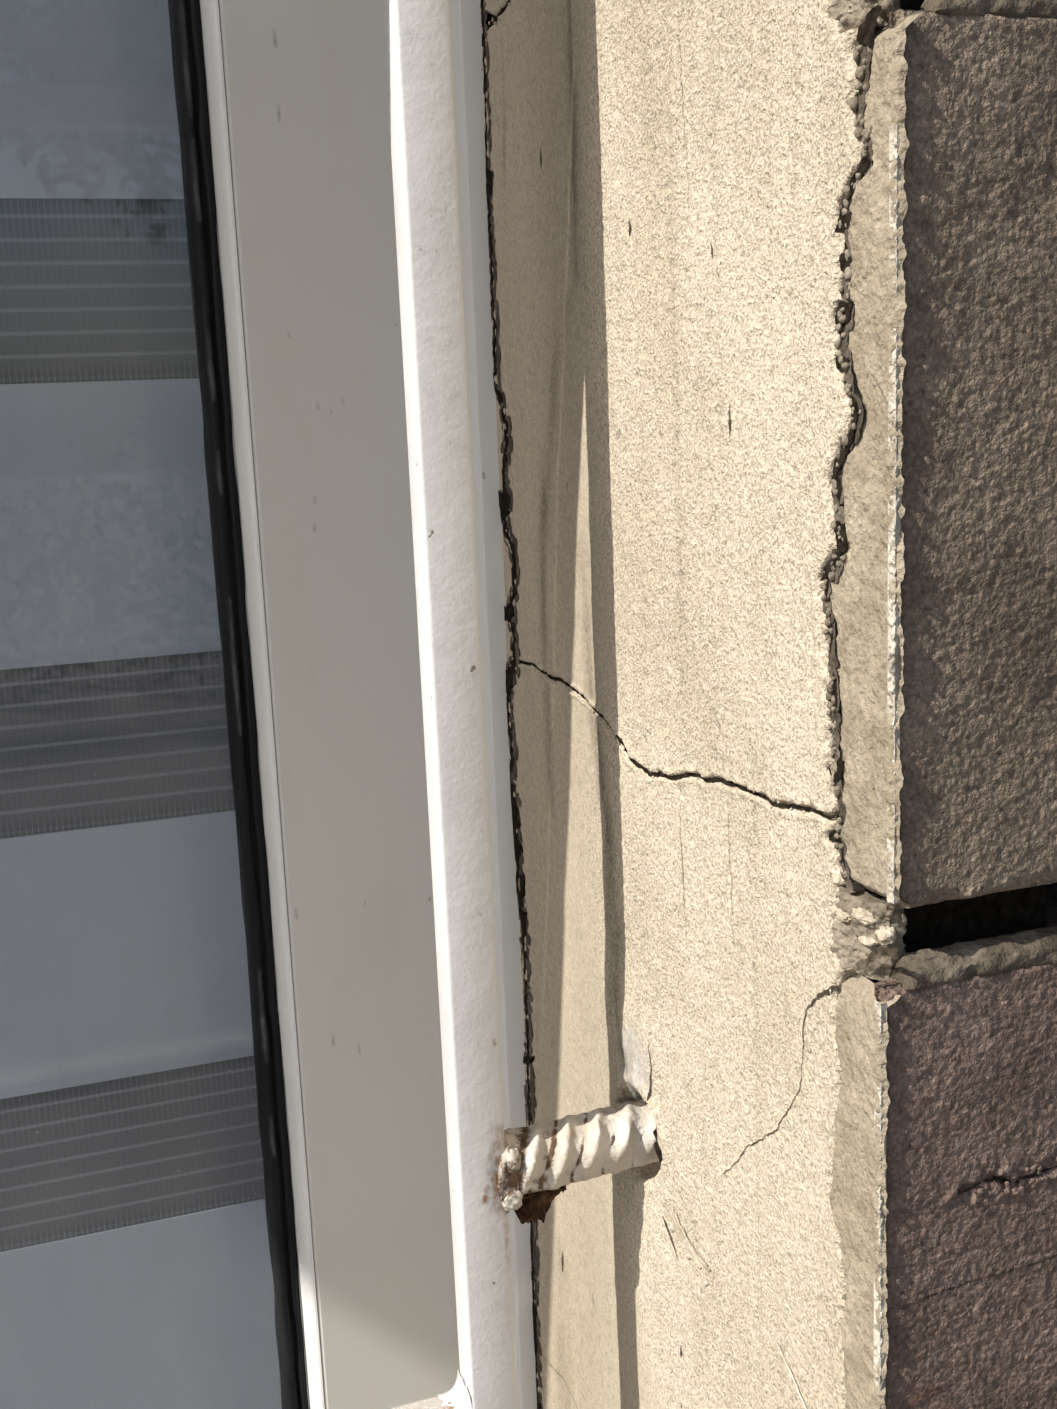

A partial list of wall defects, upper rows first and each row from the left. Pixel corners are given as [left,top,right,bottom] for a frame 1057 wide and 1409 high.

spalling [821,0,901,33]
crack [480,0,882,1126]
spalling [830,885,907,981]
crack [722,948,898,1175]
rust [514,1185,567,1224]
crack [962,1165,1057,1200]
crack [530,1220,542,1409]
crack [908,1254,1057,1307]